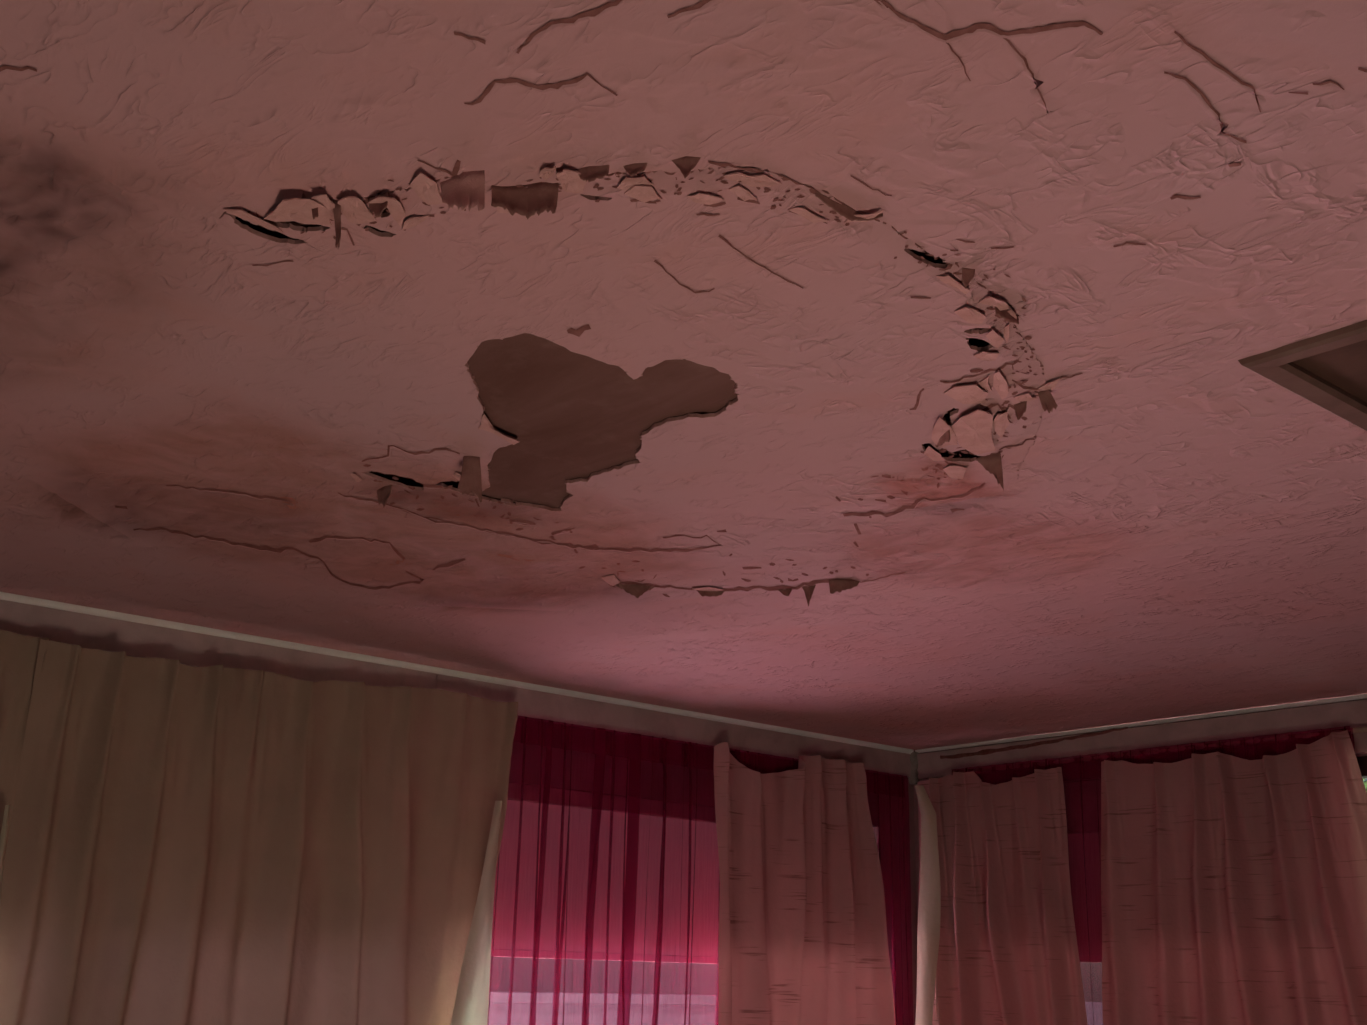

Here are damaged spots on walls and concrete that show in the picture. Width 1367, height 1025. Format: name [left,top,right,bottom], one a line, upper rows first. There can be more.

crack [454,0,633,107]
crack [667,0,724,20]
crack [874,0,1103,113]
peeling [453,333,737,508]